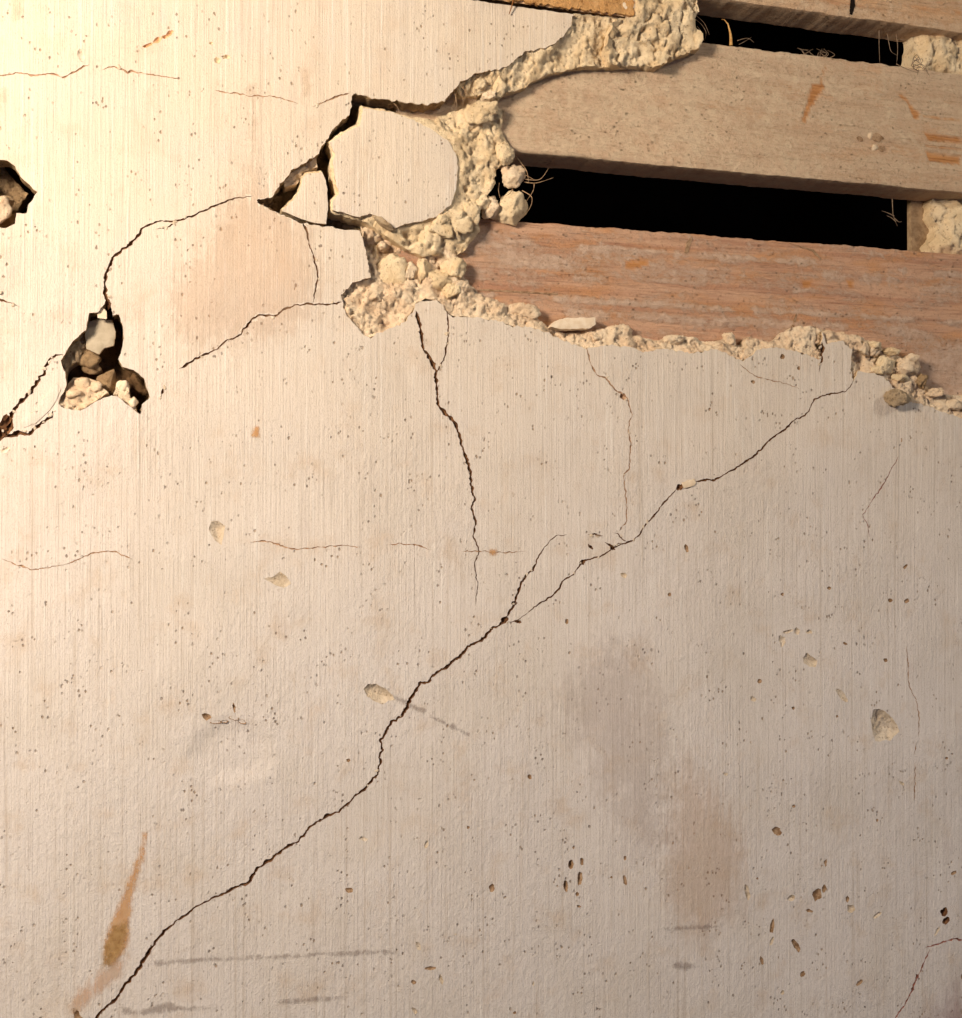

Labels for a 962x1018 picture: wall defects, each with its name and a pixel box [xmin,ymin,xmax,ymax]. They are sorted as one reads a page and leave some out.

crack [0,64,179,79]
spalling [453,0,704,102]
spalling [0,167,35,228]
crack [103,196,251,310]
spalling [263,184,299,213]
spalling [316,101,395,203]
crack [0,354,63,453]
spalling [20,305,149,427]
crack [159,223,340,400]
spalling [323,218,962,418]
crack [95,310,853,1018]
corrosion [74,848,144,1012]